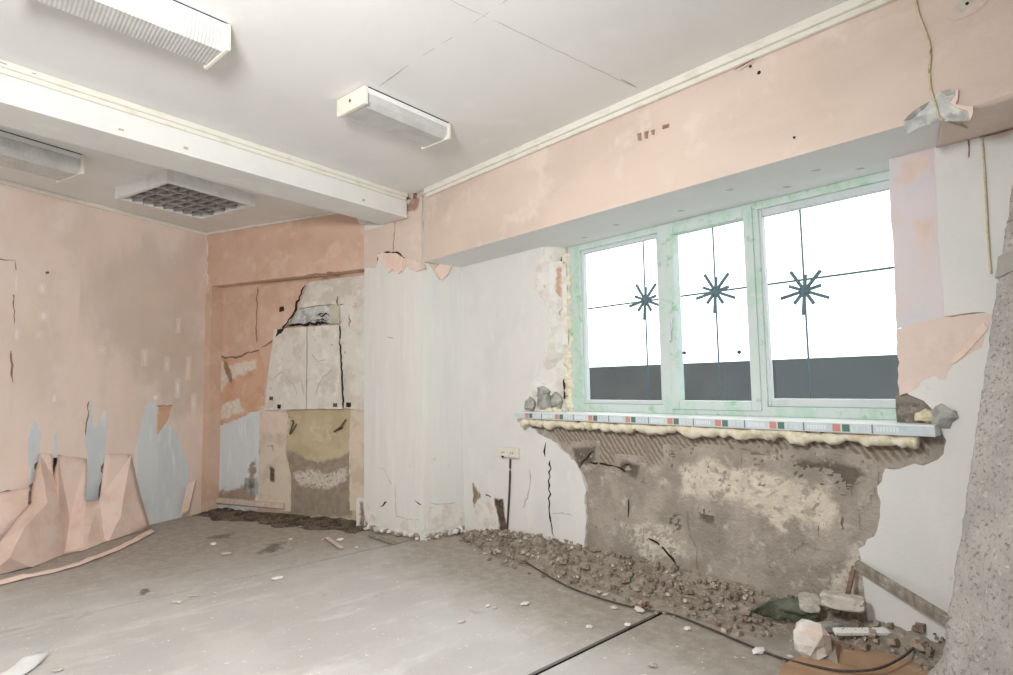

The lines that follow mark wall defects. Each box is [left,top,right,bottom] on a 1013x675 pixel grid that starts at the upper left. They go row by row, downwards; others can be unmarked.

spalling [903,89,974,134]
spalling [524,246,568,411]
crack [8,351,16,382]
peeling [220,355,260,425]
spalling [287,408,351,454]
spalling [533,389,959,556]
spalling [687,511,867,664]